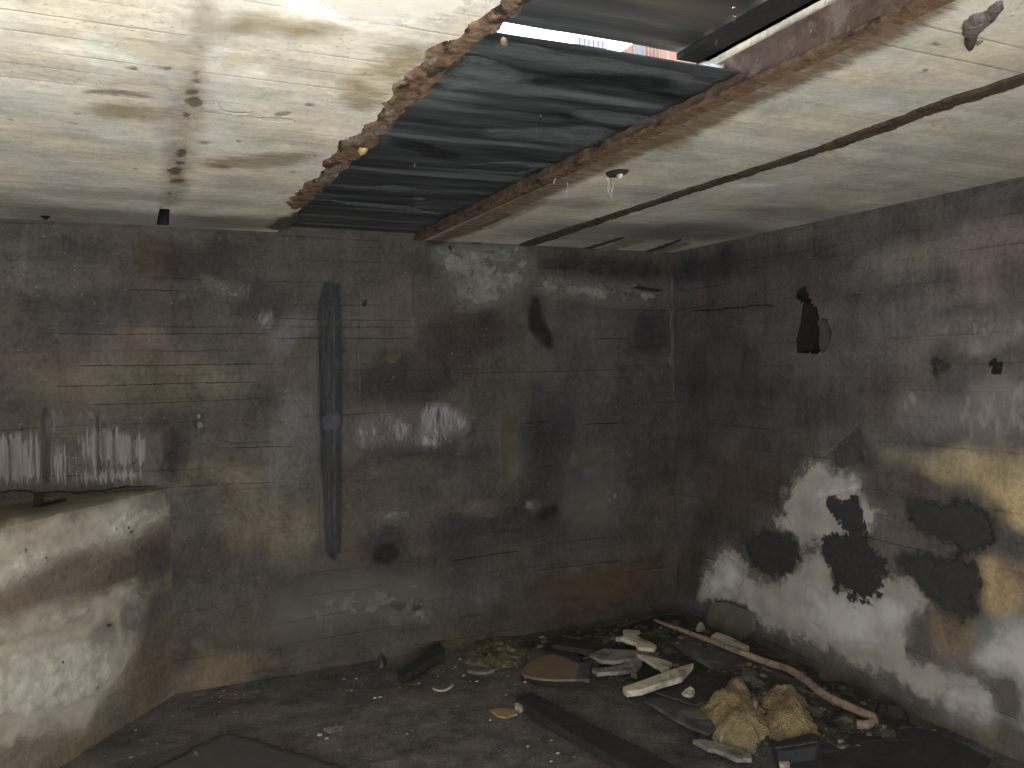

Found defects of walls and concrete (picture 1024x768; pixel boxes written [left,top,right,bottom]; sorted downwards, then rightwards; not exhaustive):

water stain [529,297,553,348]
crack [694,301,800,318]
spalling [796,286,832,354]
spalling [989,358,1003,375]
mould [746,528,803,578]
mould [821,495,996,624]
water stain [990,680,1021,714]